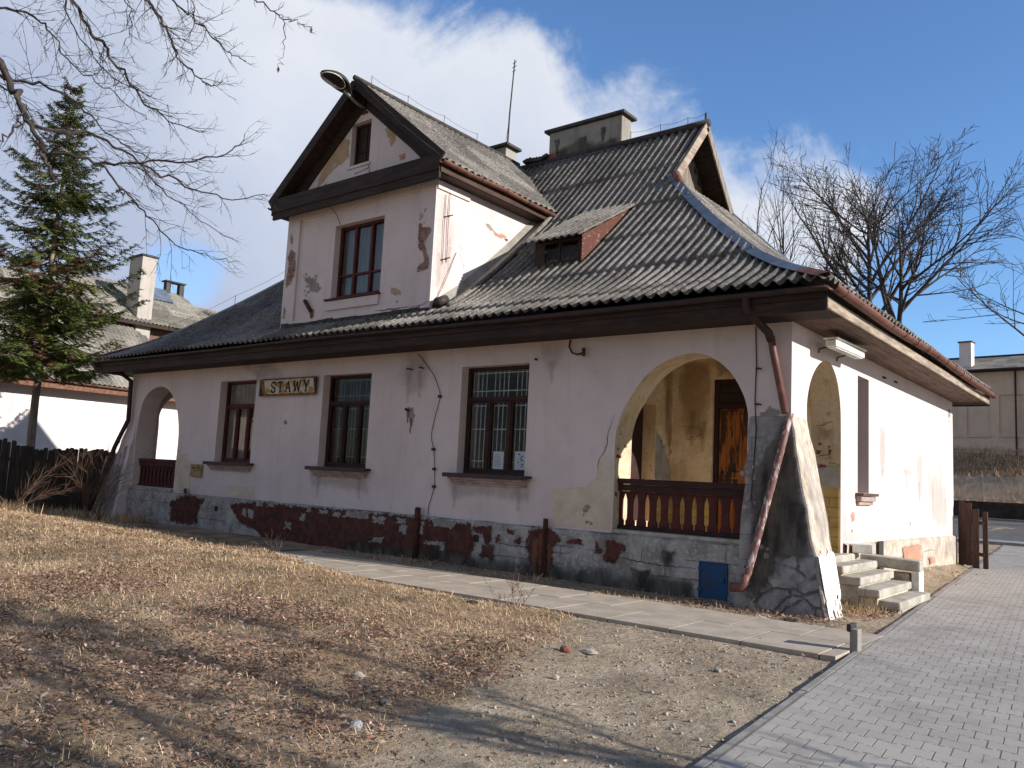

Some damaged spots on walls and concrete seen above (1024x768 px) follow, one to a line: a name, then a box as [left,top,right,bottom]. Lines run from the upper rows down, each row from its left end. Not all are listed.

peeling [227,485,521,560]